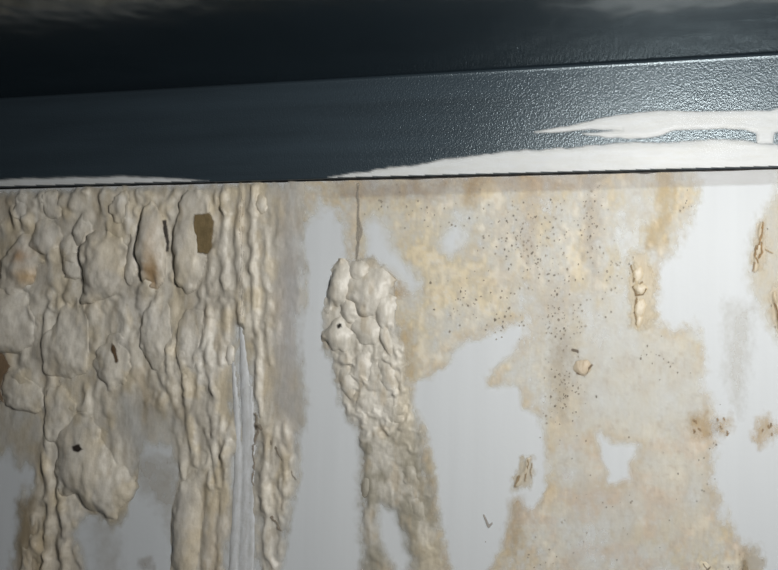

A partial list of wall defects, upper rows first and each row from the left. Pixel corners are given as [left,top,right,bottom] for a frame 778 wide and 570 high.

peeling [629,253,655,331]
peeling [751,222,773,273]
water stain [755,200,778,328]
peeling [770,287,778,327]
water stain [304,172,763,570]